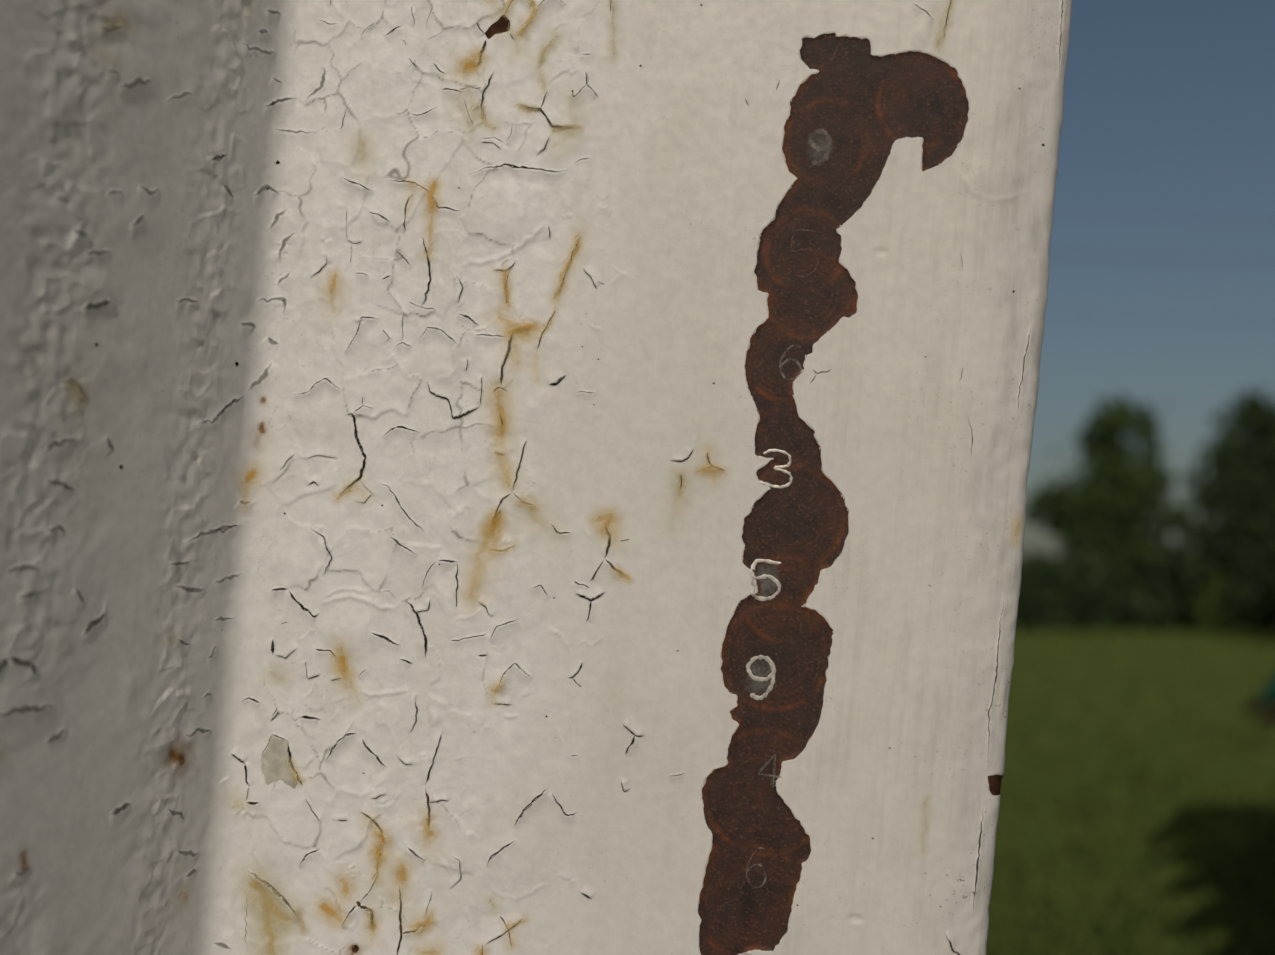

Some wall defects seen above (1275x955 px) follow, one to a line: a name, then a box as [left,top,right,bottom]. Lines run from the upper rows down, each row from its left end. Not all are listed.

peeling [485,14,510,39]
rust [427,182,438,237]
rust [555,240,580,298]
rust [507,321,537,335]
crack [232,0,629,955]
rust [488,514,500,536]
peeling [261,734,298,789]
crack [621,715,646,792]
rust [375,832,387,868]
rust [319,903,337,917]